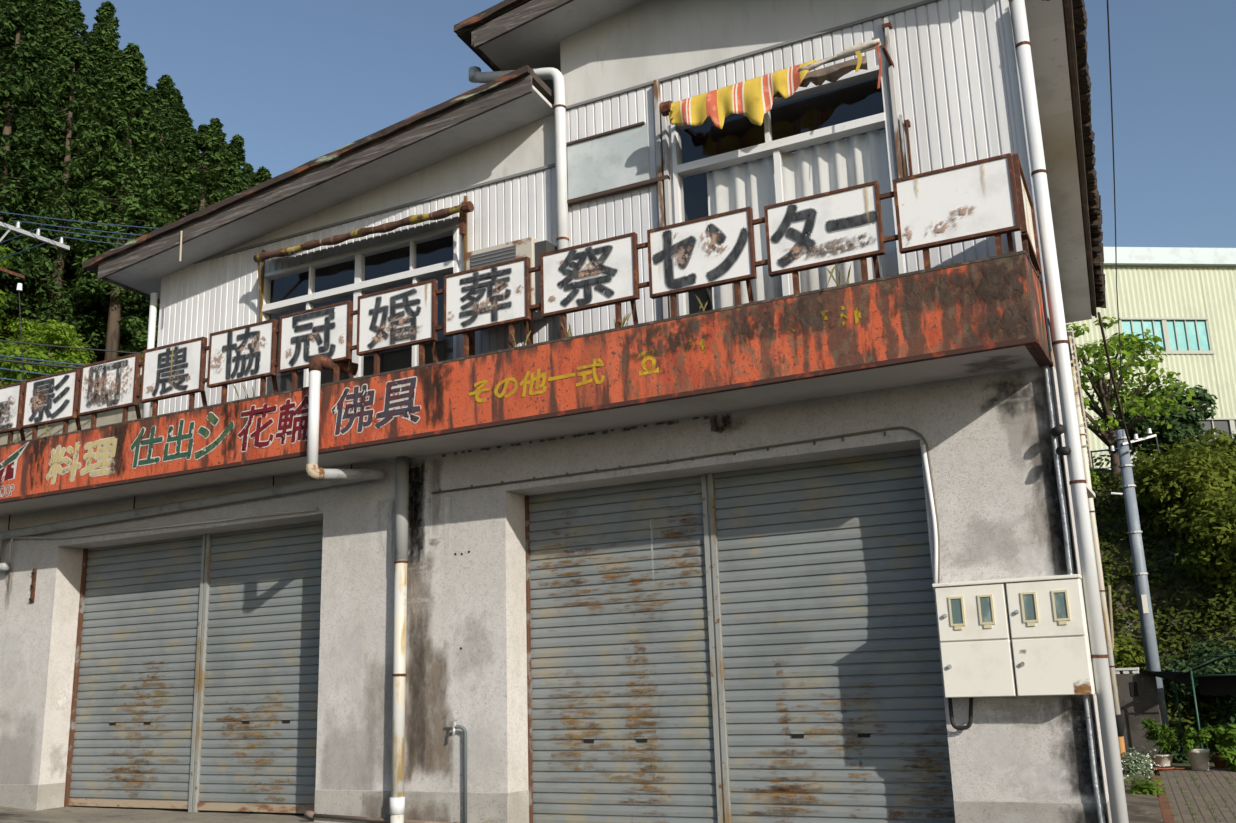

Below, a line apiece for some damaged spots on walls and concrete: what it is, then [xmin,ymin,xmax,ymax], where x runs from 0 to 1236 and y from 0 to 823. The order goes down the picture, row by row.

damp [989,376,1055,448]
damp [379,501,390,544]
rust [550,523,666,612]
damp [1016,420,1077,575]
damp [406,464,483,777]
rust [116,662,164,795]
rust [218,705,289,798]
rust [547,683,610,771]
rust [624,648,660,803]
rust [758,779,815,811]